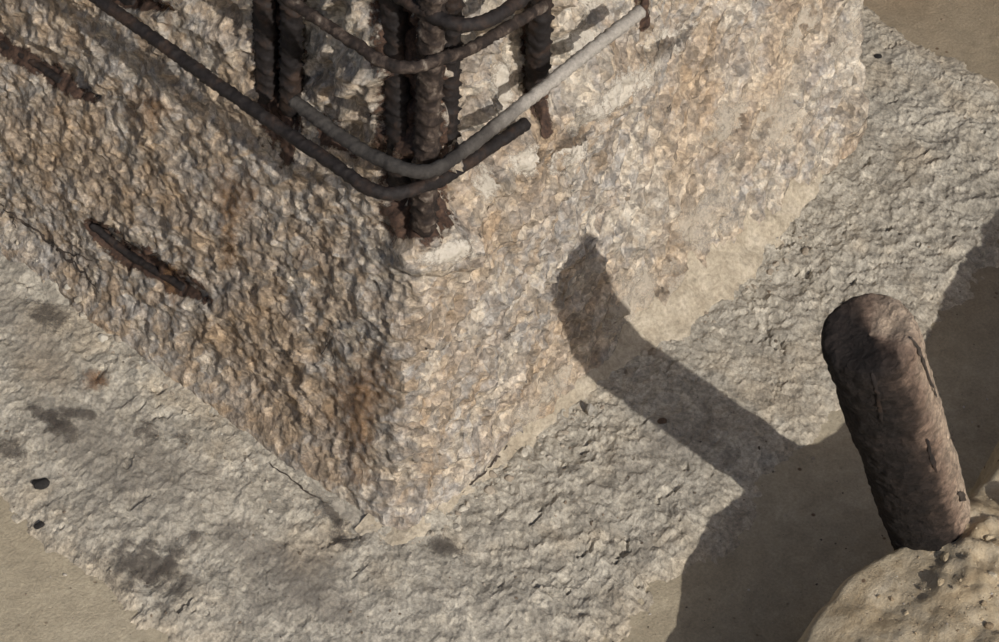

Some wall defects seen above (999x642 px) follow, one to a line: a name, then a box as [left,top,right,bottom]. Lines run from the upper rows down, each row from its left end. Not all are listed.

rust [634,0,651,32]
spalling [0,29,98,103]
rust [255,124,296,169]
rust [530,92,553,139]
spalling [509,58,663,176]
crack [0,204,99,293]
spalling [83,218,213,305]
spalling [370,170,478,265]
water stain [0,439,27,459]
water stain [29,405,97,443]
crack [270,463,333,506]
water stain [107,531,201,599]